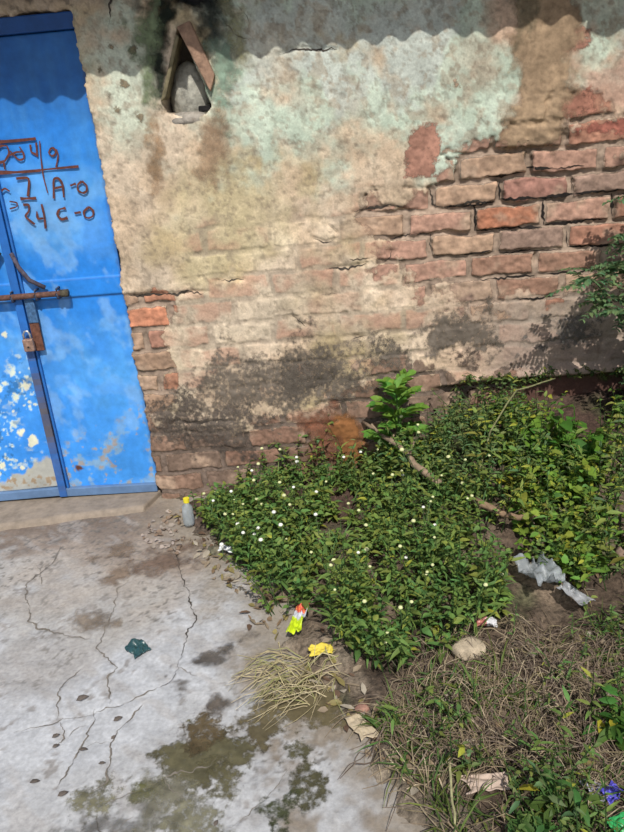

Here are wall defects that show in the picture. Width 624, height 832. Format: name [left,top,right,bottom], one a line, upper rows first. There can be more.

leakage [144,1,177,98]
leakage [198,0,246,59]
crack [280,47,336,55]
leakage [500,0,585,151]
spalling [351,86,624,323]
leakage [414,296,504,371]
leakage [538,308,602,350]
leakage [147,316,410,467]
crack [16,546,213,832]
leakage [193,644,232,665]
leakage [206,694,228,714]
leakage [82,772,188,832]